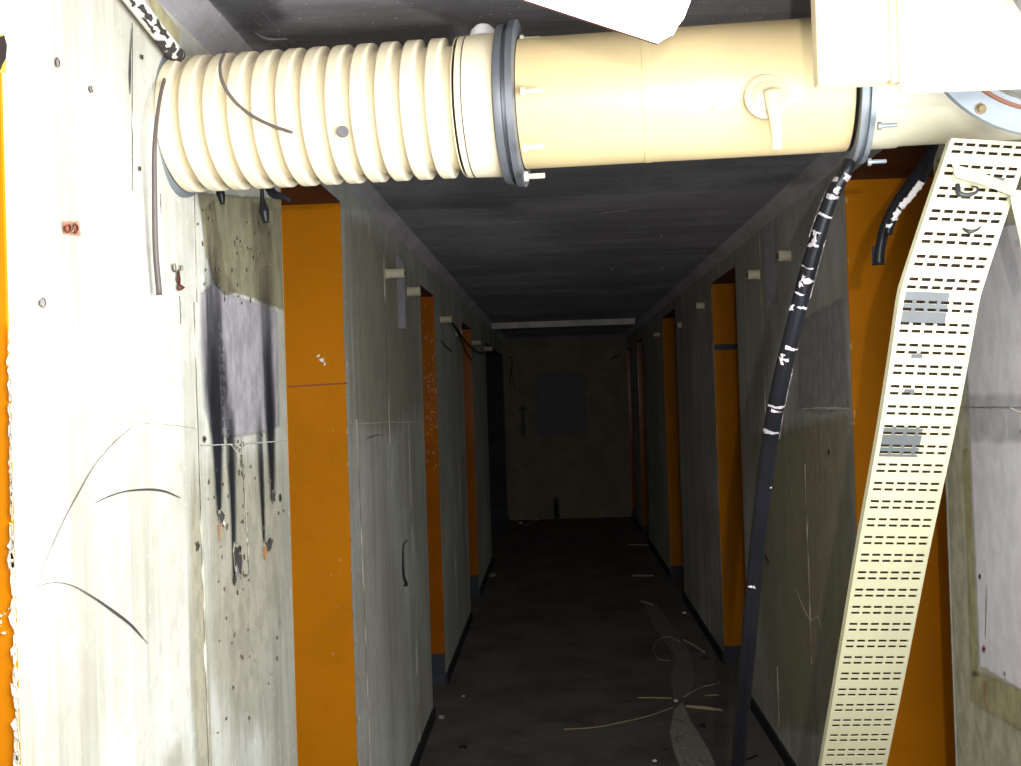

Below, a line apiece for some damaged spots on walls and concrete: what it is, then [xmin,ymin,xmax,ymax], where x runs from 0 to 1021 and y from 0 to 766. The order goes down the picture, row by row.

damp [198,193,283,438]
crack [37,428,131,583]
crack [202,440,287,461]
damp [947,198,1021,766]